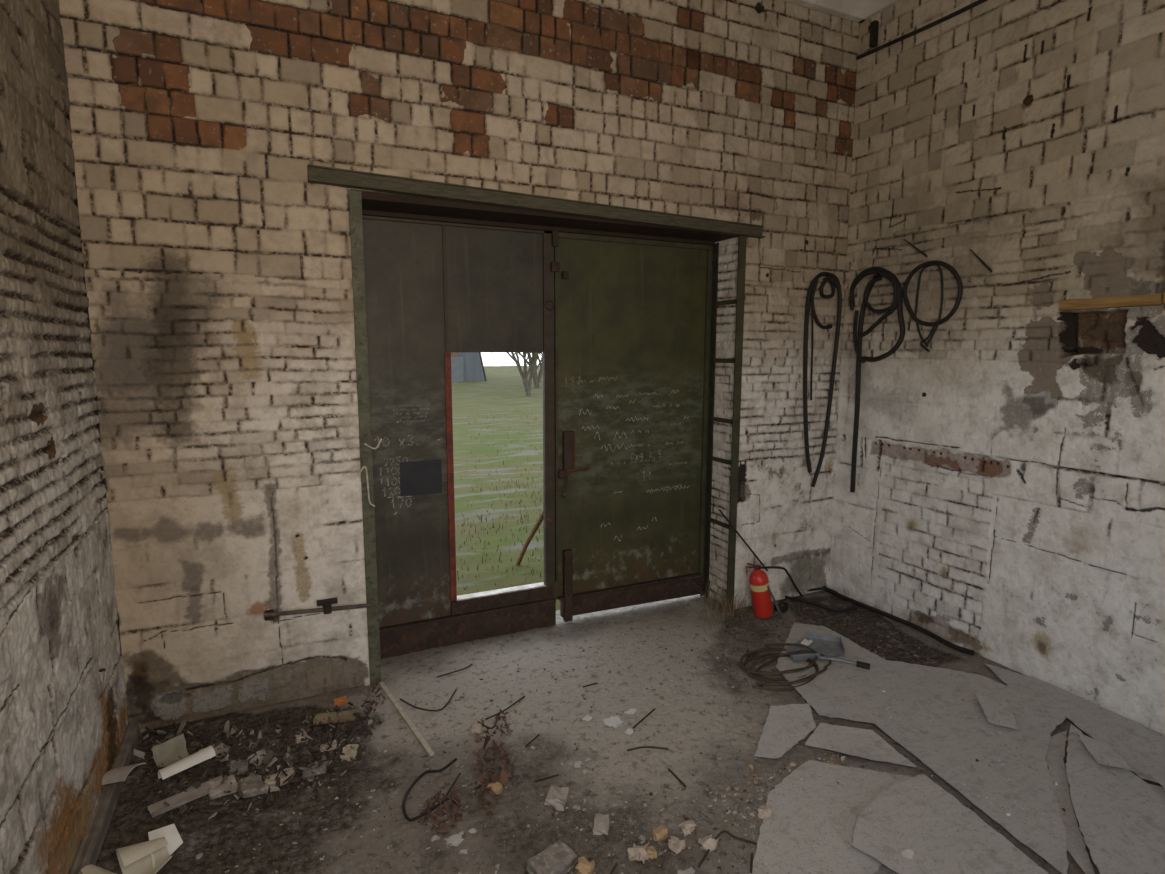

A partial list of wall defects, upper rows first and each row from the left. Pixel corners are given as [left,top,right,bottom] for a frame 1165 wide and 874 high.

peeling [111,0,796,158]
peeling [793,56,856,117]
peeling [835,120,853,156]
water stain [95,259,213,440]
peeling [1004,245,1165,452]
spalling [917,611,933,624]
spalling [946,628,973,644]
crack [0,658,106,826]
rust [38,688,129,874]